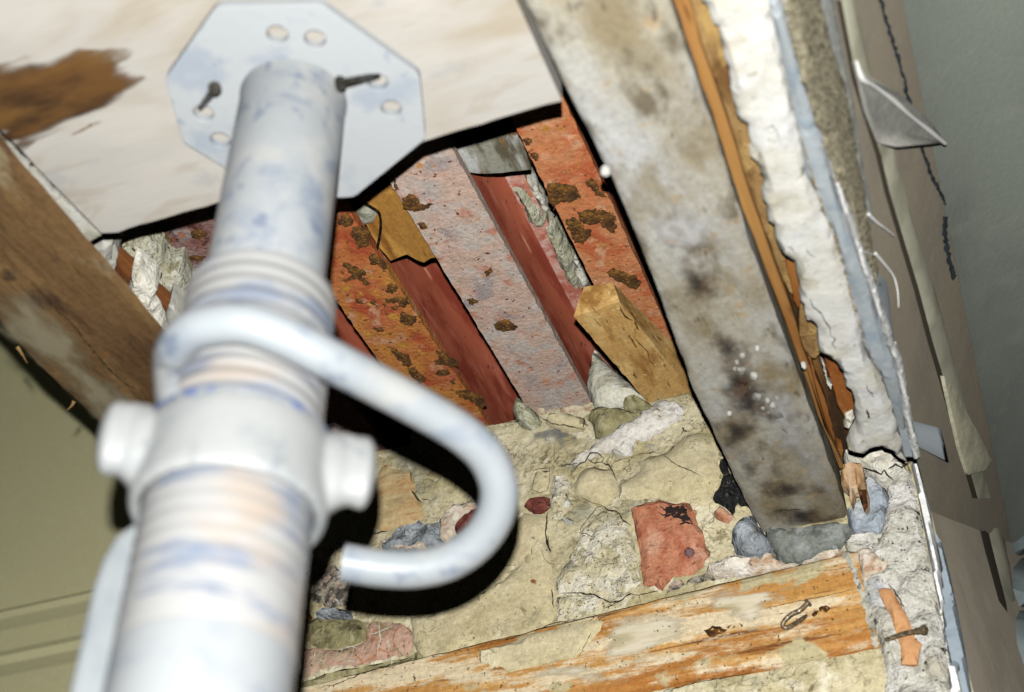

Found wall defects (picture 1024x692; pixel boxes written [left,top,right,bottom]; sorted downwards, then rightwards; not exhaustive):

efflorescence [659,217,705,245]
leakage [689,274,711,292]
leakage [720,340,733,354]
leakage [729,374,756,409]
efflorescence [565,400,685,468]
leakage [729,423,752,443]
crack [508,408,699,564]
leakage [780,511,834,522]
hole [703,625,731,638]